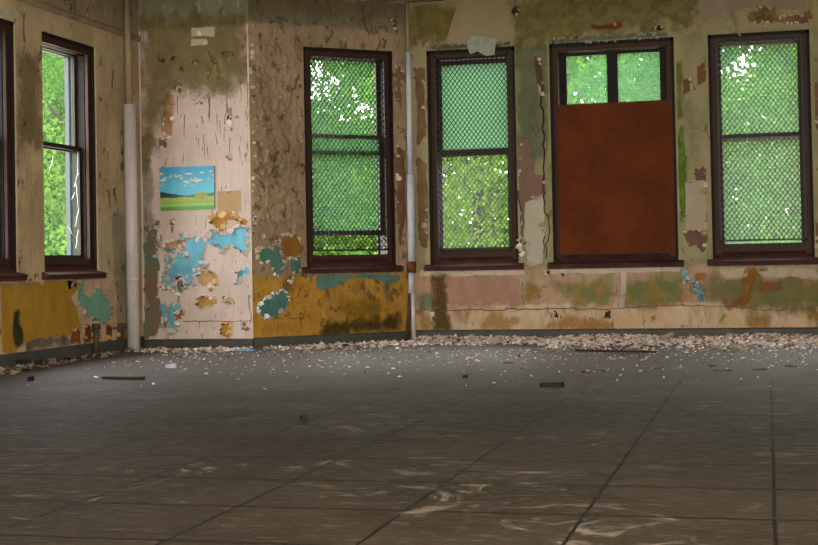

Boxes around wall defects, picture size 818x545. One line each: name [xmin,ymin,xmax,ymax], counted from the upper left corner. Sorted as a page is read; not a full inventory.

leakage [140,12,247,172]
leakage [514,0,699,160]
peeling [747,5,813,25]
peeling [143,31,305,340]
peeling [419,139,704,319]